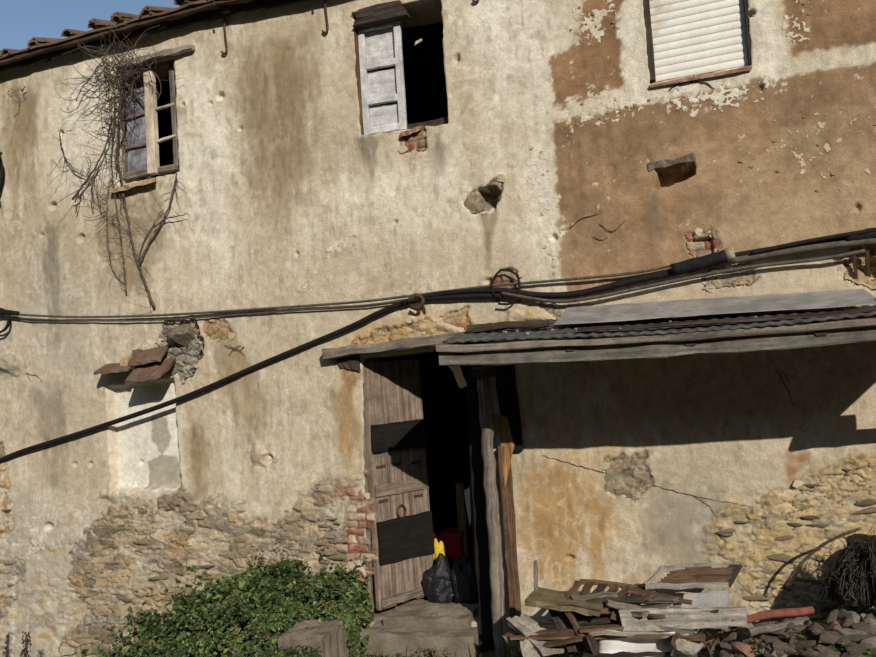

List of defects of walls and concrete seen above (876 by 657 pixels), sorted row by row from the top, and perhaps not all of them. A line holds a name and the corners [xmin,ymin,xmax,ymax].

peeling [570,0,616,46]
peeling [671,74,770,117]
spalling [398,126,427,154]
spalling [464,174,506,215]
crack [569,214,626,240]
spalling [685,228,721,258]
spalling [351,305,472,344]
spalling [94,315,235,385]
spalling [602,452,657,502]
crack [653,485,750,519]
spalling [705,453,876,619]
spalling [61,469,377,657]